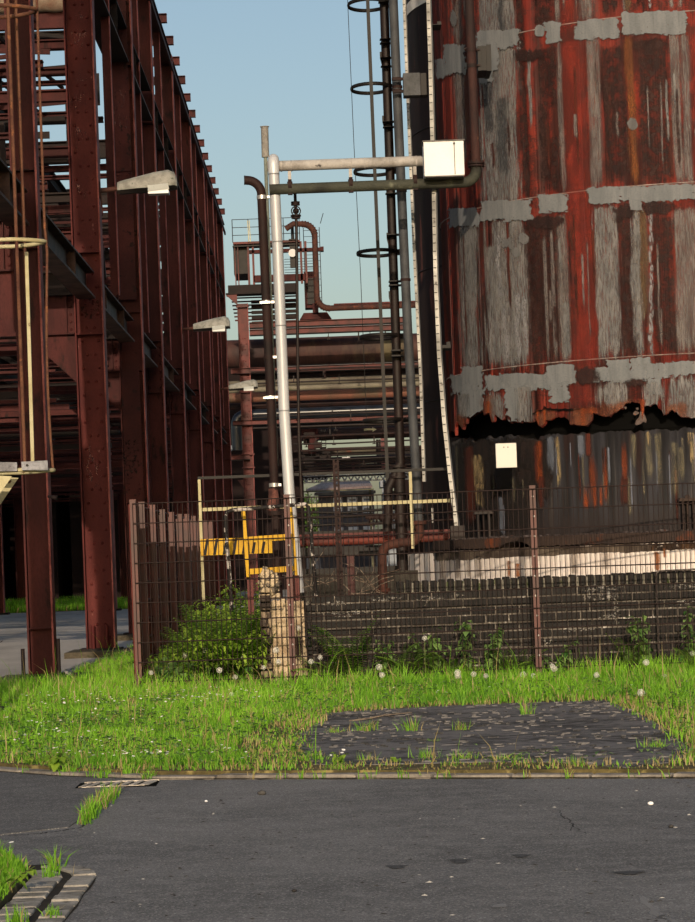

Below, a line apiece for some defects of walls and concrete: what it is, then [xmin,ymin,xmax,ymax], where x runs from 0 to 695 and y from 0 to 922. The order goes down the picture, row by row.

peeling [535,21,562,44]
peeling [574,10,688,40]
rust [624,37,636,118]
rust [629,129,638,186]
peeling [447,193,569,229]
peeling [586,183,695,212]
rust [634,211,648,319]
peeling [450,363,577,422]
rust [537,410,556,426]
peeling [593,357,695,394]
rust [667,403,687,417]
rust [572,399,644,512]